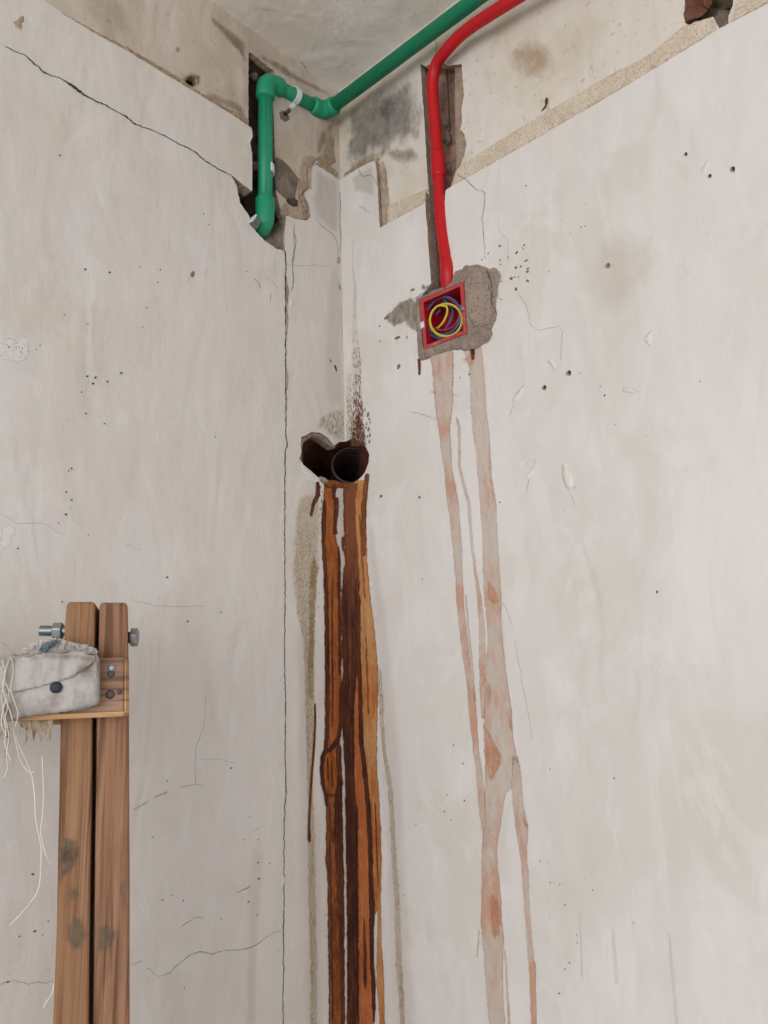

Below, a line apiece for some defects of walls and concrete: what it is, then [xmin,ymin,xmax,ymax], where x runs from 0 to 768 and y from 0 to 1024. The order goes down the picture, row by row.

crack [6,46,230,175]
water stain [350,89,412,164]
flaking render [425,0,768,191]
spalling [299,432,369,483]
rust [350,339,371,446]
crack [132,232,297,1024]
rust [307,474,385,1024]
rust [431,347,537,1024]